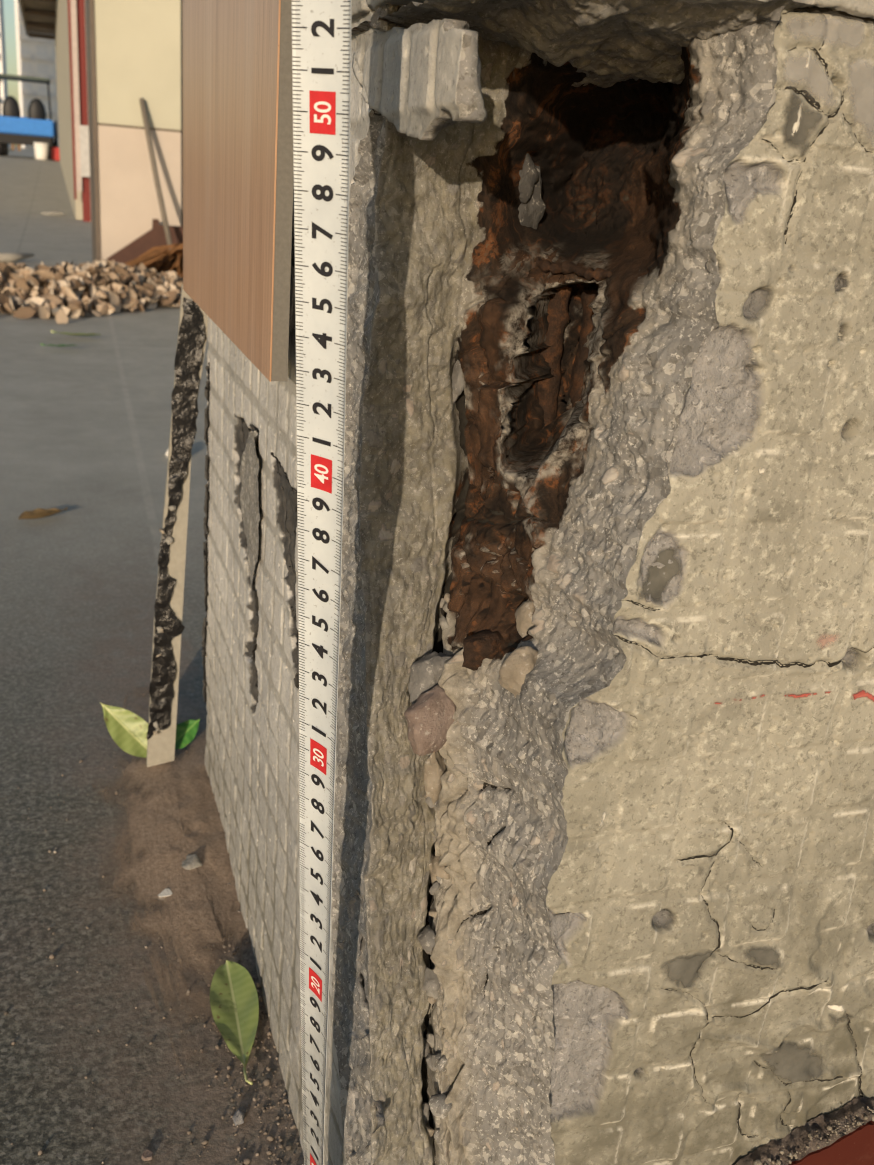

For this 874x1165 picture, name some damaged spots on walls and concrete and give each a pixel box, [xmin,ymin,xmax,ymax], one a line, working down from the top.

crack [762,6,874,244]
corrosion [463,299,510,498]
corrosion [511,144,671,426]
spalling [273,455,299,673]
crack [432,391,535,653]
corrosion [447,535,537,643]
spalling [331,0,830,1165]
crack [614,635,874,668]
crack [421,848,450,1162]
crack [457,910,488,932]
crack [661,823,827,1104]
crack [737,1013,863,1138]